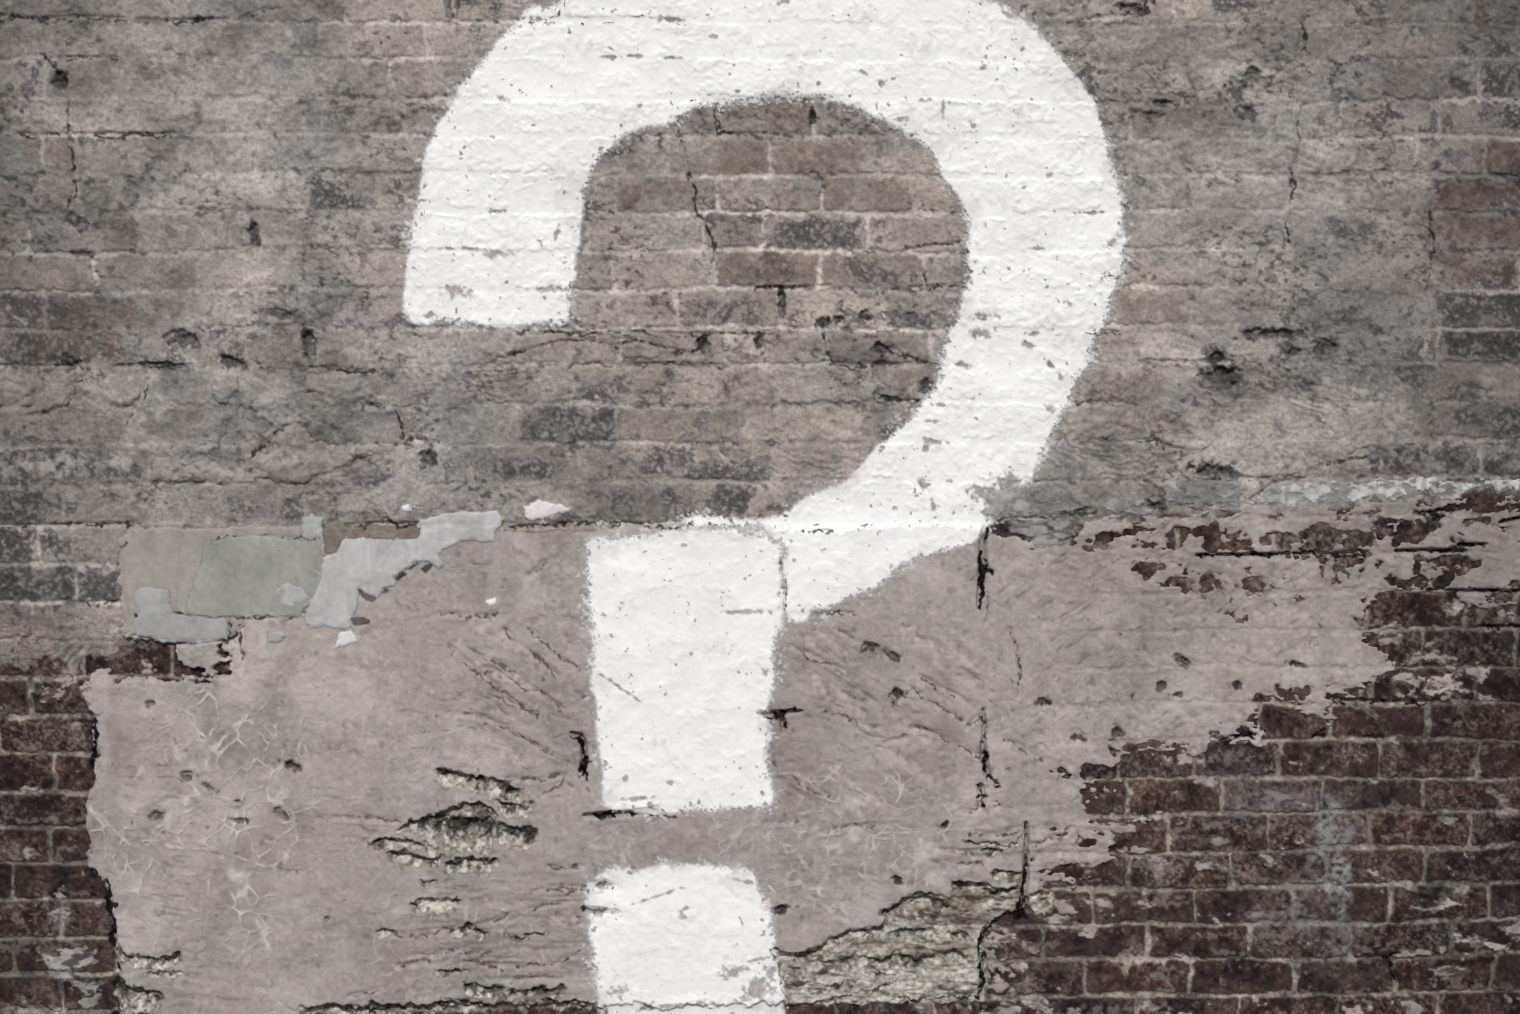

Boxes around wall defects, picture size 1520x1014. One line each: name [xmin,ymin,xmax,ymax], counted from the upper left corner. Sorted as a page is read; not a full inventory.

spalling [1234,326,1340,358]
crack [282,520,414,540]
crack [509,519,734,529]
peeling [980,461,1520,548]
peeling [301,500,596,648]
crack [977,510,1096,685]
peeling [1378,621,1497,704]
spalling [367,767,548,944]
crack [365,716,1066,1000]
spalling [297,968,597,1014]
spalling [770,831,1113,1014]
peeling [1416,920,1520,987]